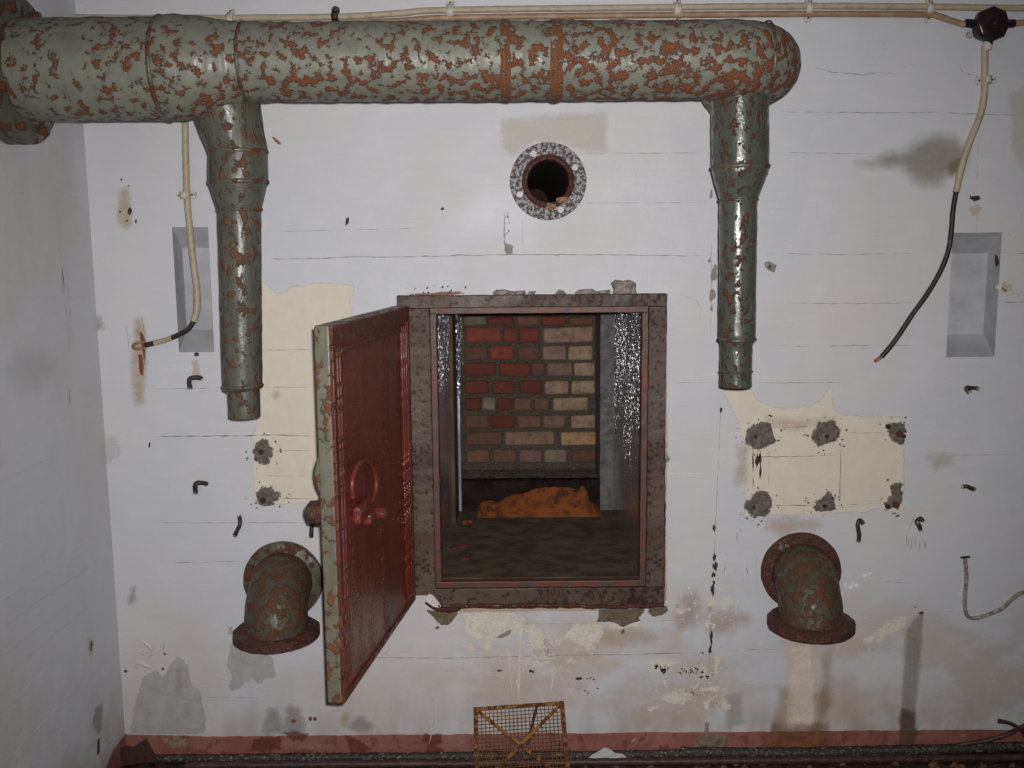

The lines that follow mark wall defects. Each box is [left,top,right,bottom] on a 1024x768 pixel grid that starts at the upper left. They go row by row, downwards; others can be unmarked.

rust [119,179,137,224]
rust [127,322,146,402]
peeling [245,281,354,509]
peeling [720,388,909,525]
peeling [425,553,747,747]
water stain [900,607,924,745]